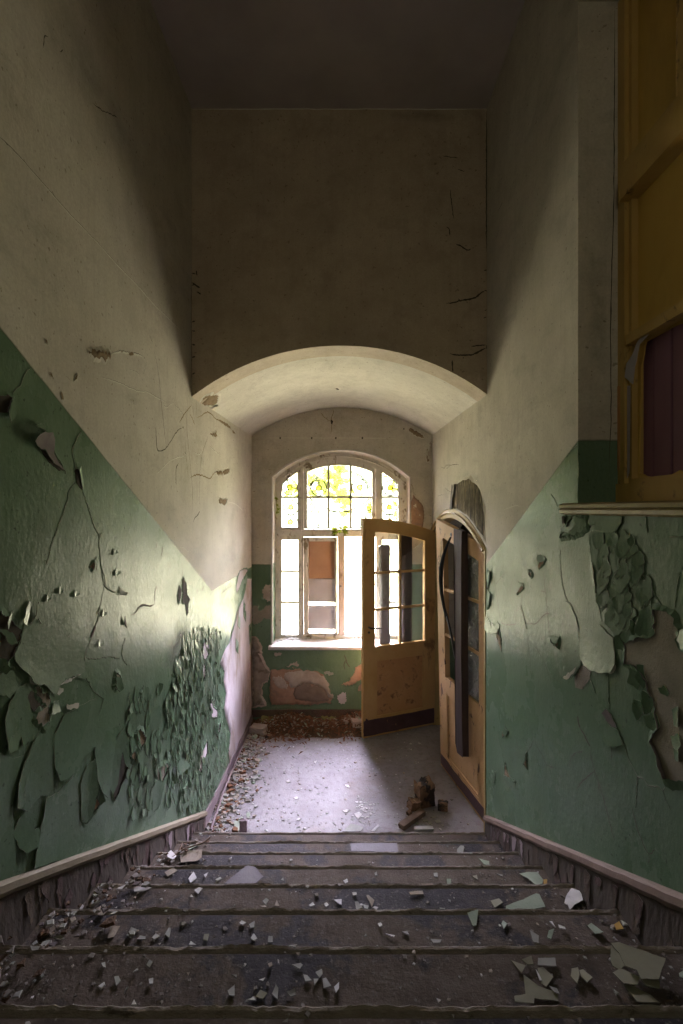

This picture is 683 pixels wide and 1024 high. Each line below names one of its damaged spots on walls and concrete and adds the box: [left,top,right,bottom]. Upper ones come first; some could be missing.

crack [193,108,487,318]
spalling [87,346,146,373]
crack [450,345,487,371]
peeling [0,369,30,422]
spalling [200,392,221,410]
peeling [36,423,67,474]
crack [154,352,235,522]
spalling [190,429,230,484]
spalling [450,475,486,541]
peeling [549,515,683,791]
peeling [0,568,361,951]